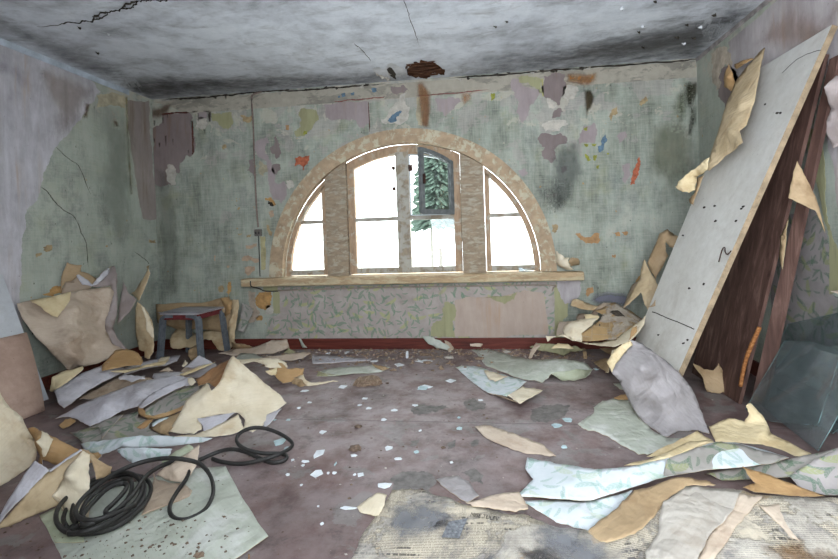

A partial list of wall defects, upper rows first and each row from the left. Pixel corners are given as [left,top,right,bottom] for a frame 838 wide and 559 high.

crack [37,0,168,27]
flaking render [381,92,422,125]
corrosion [419,84,429,126]
flaking render [562,85,579,101]
damp [679,83,696,129]
flaking render [542,119,568,132]
flaking render [166,164,177,185]
damp [548,147,578,202]
crack [43,188,88,262]
peeling [576,233,600,244]
peeling [43,286,63,296]
peeling [454,290,548,338]